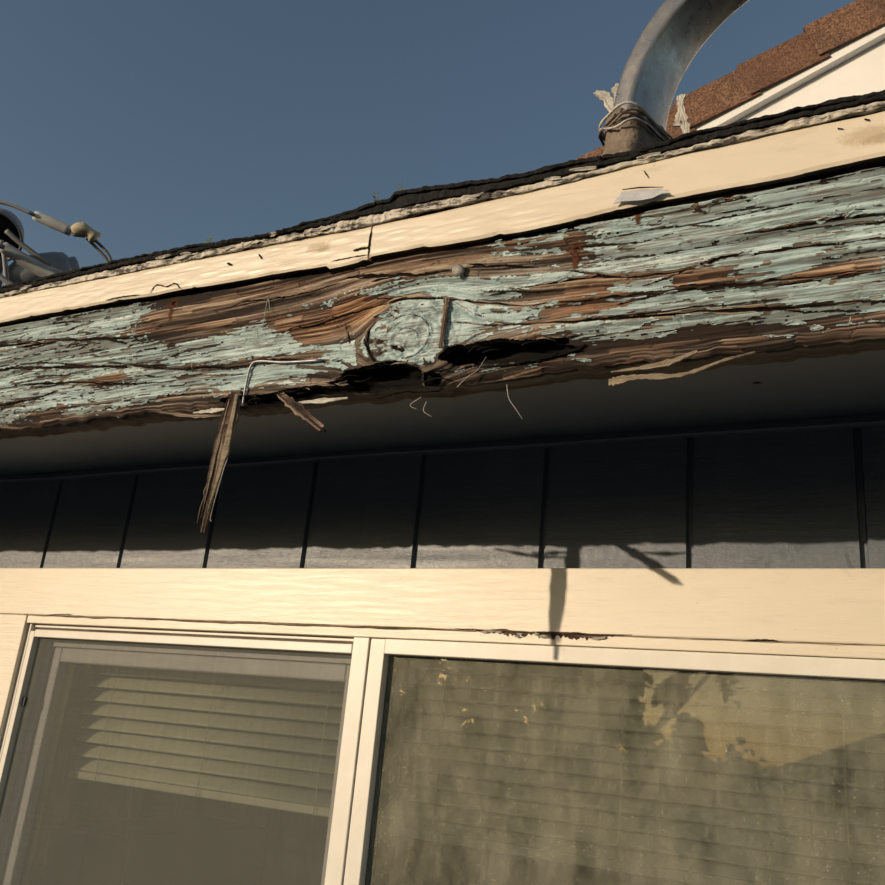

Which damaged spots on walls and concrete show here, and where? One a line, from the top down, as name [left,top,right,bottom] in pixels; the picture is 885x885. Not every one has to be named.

peeling [614,187,669,204]
peeling [753,209,874,232]
peeling [780,253,885,287]
peeling [118,224,771,418]
peeling [565,299,885,363]
peeling [4,364,148,430]
crack [23,614,474,631]
crack [633,636,831,644]